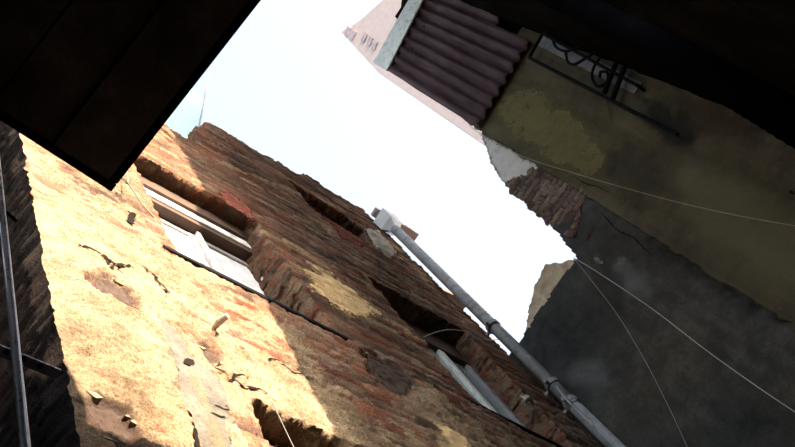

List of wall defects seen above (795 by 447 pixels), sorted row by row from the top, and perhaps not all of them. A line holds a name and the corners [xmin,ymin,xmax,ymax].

peeling [480,88,608,238]
spalling [91,273,138,309]
crack [78,244,170,293]
spalling [198,342,225,371]
spalling [361,350,418,396]
spalling [79,391,139,447]
flaking render [225,420,249,447]